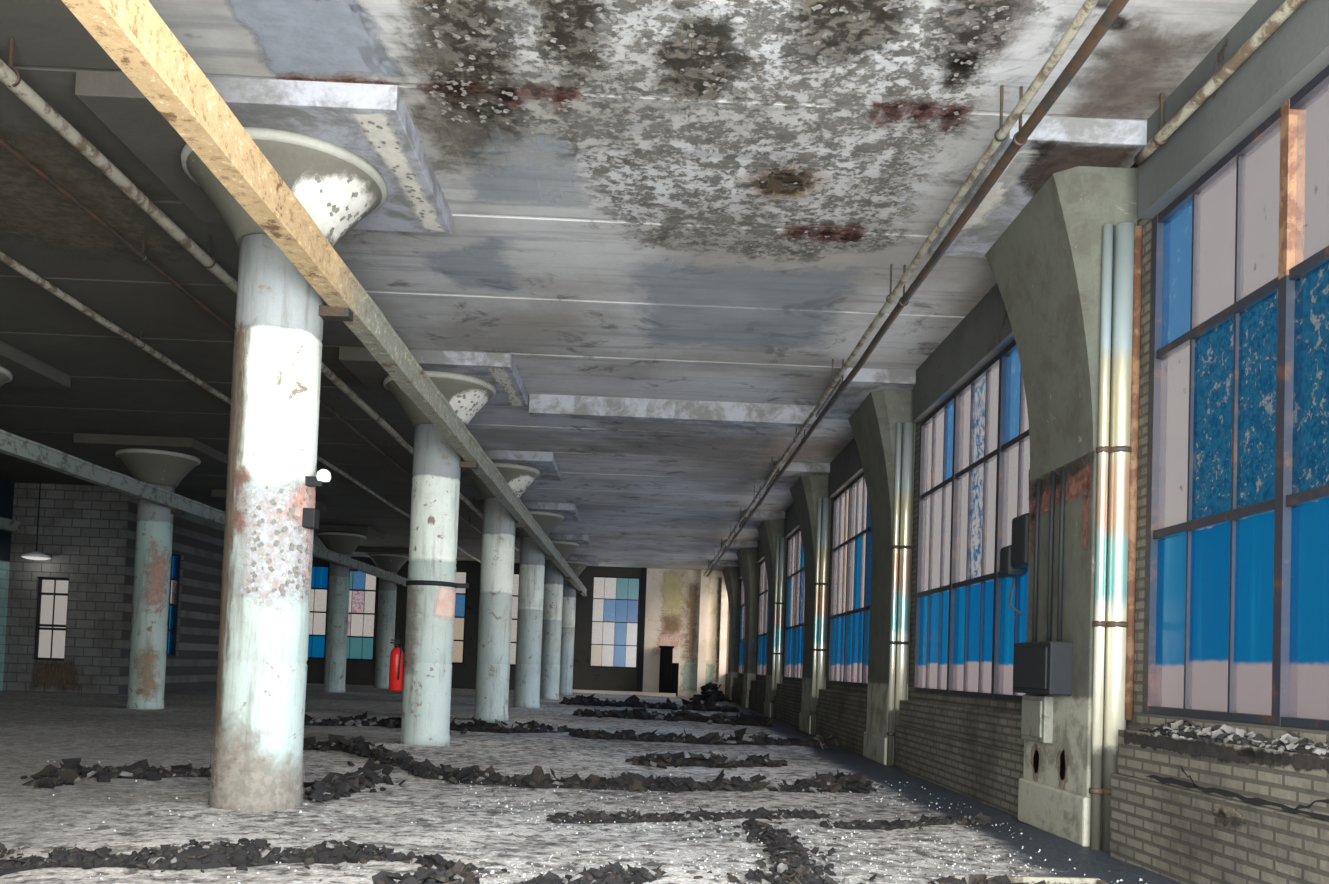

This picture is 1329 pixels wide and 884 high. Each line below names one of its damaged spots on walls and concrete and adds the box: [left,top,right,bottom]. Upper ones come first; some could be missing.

peeling [293,171,372,241]
peeling [353,113,444,232]
leakage [396,0,520,163]
corrosion [419,82,581,111]
leakage [656,5,756,101]
peeling [422,0,1044,261]
corrosion [781,223,867,243]
leakage [788,0,906,65]
corrosion [869,101,972,131]
leakage [938,0,1029,88]
corrosion [280,485,316,589]
crack [1146,765,1329,820]